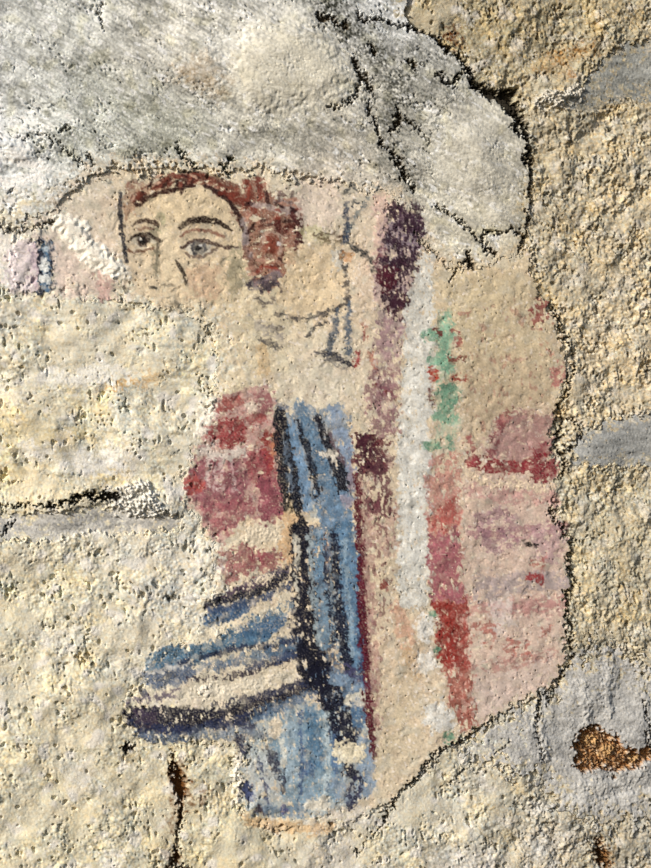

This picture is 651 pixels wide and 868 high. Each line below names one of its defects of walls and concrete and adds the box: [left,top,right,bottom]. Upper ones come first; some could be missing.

crack [95,0,110,33]
crack [15,121,97,172]
crack [174,140,238,180]
crack [312,5,538,284]
crack [5,183,20,195]
crack [0,214,57,237]
crack [546,298,589,480]
crack [0,486,123,538]
crack [353,503,582,861]
rust [154,745,221,868]